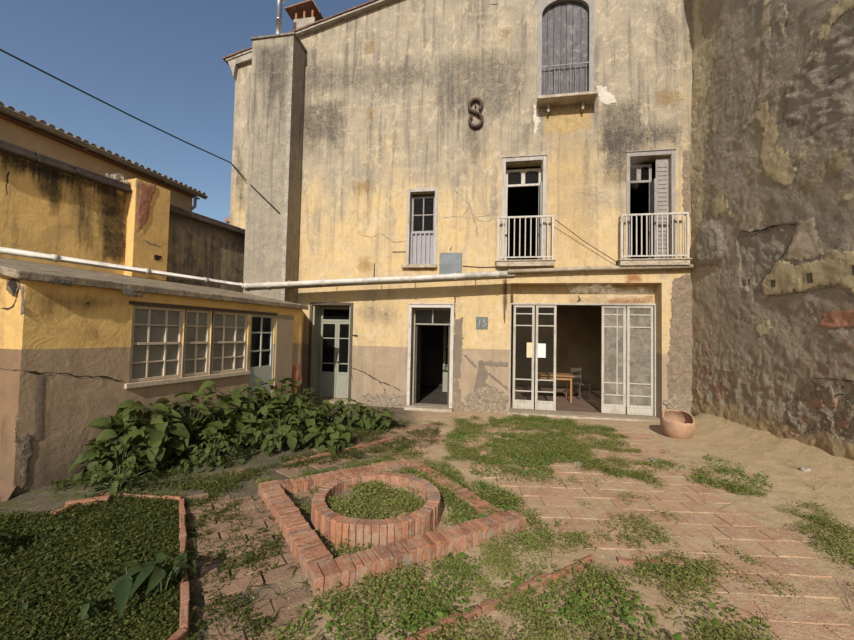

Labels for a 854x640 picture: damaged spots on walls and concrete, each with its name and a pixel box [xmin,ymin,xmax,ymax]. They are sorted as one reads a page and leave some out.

peeling [533,104,591,134]
peeling [596,85,617,105]
peeling [681,0,854,298]
water stain [0,151,126,261]
peeling [135,180,156,234]
crack [0,368,135,384]
spalling [780,379,854,443]